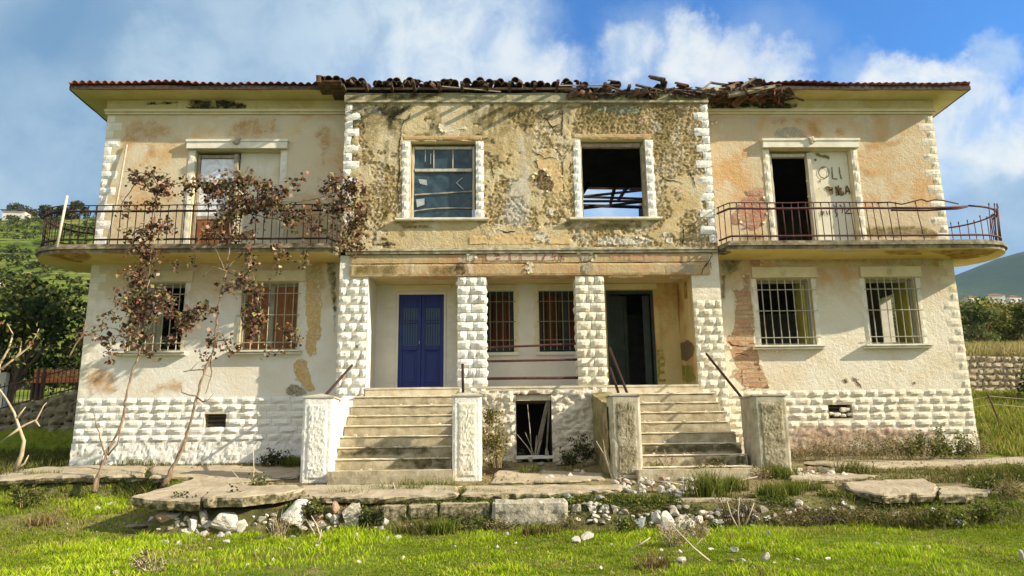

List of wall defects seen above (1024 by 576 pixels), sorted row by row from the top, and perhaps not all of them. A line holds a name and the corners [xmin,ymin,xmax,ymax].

peeling [438,123,469,133]
peeling [532,159,563,194]
flaking render [732,187,768,230]
peeling [466,223,673,274]
peeling [284,280,322,397]
flaking render [680,340,695,361]
flaking render [727,260,770,389]